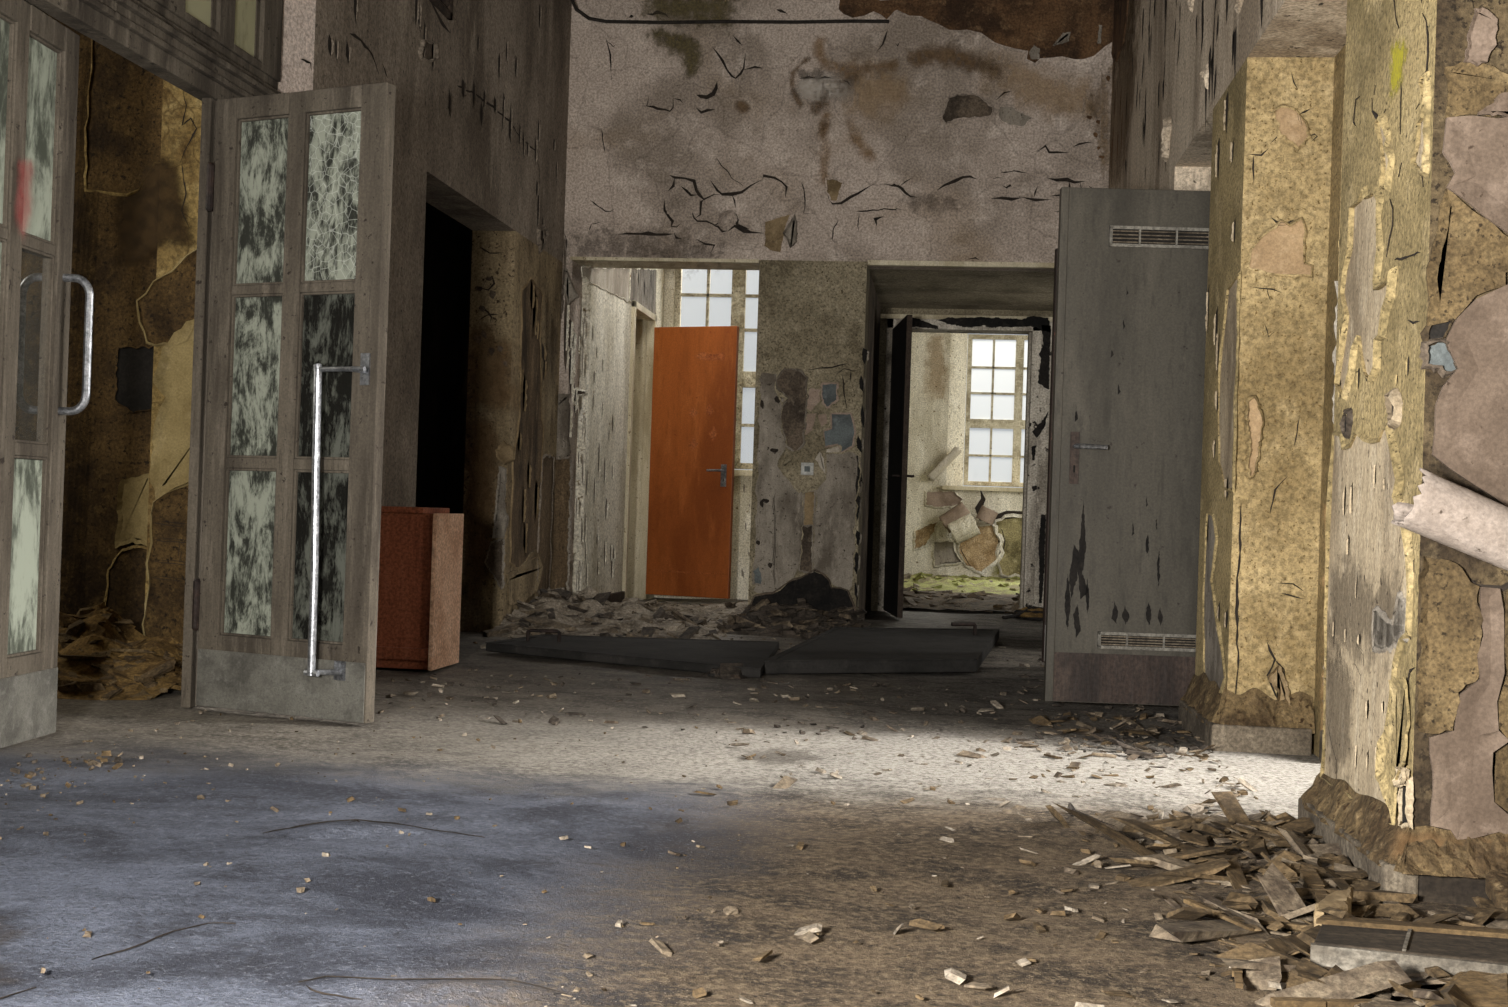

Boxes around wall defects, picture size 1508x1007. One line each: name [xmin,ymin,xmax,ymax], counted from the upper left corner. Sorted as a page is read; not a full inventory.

flaking render [83,39,163,197]
crack [565,142,1092,252]
flaking render [835,0,1263,177]
flaking render [104,248,197,643]
flaking render [741,348,869,611]
flaking render [913,446,1022,578]
flaking render [1311,7,1508,840]